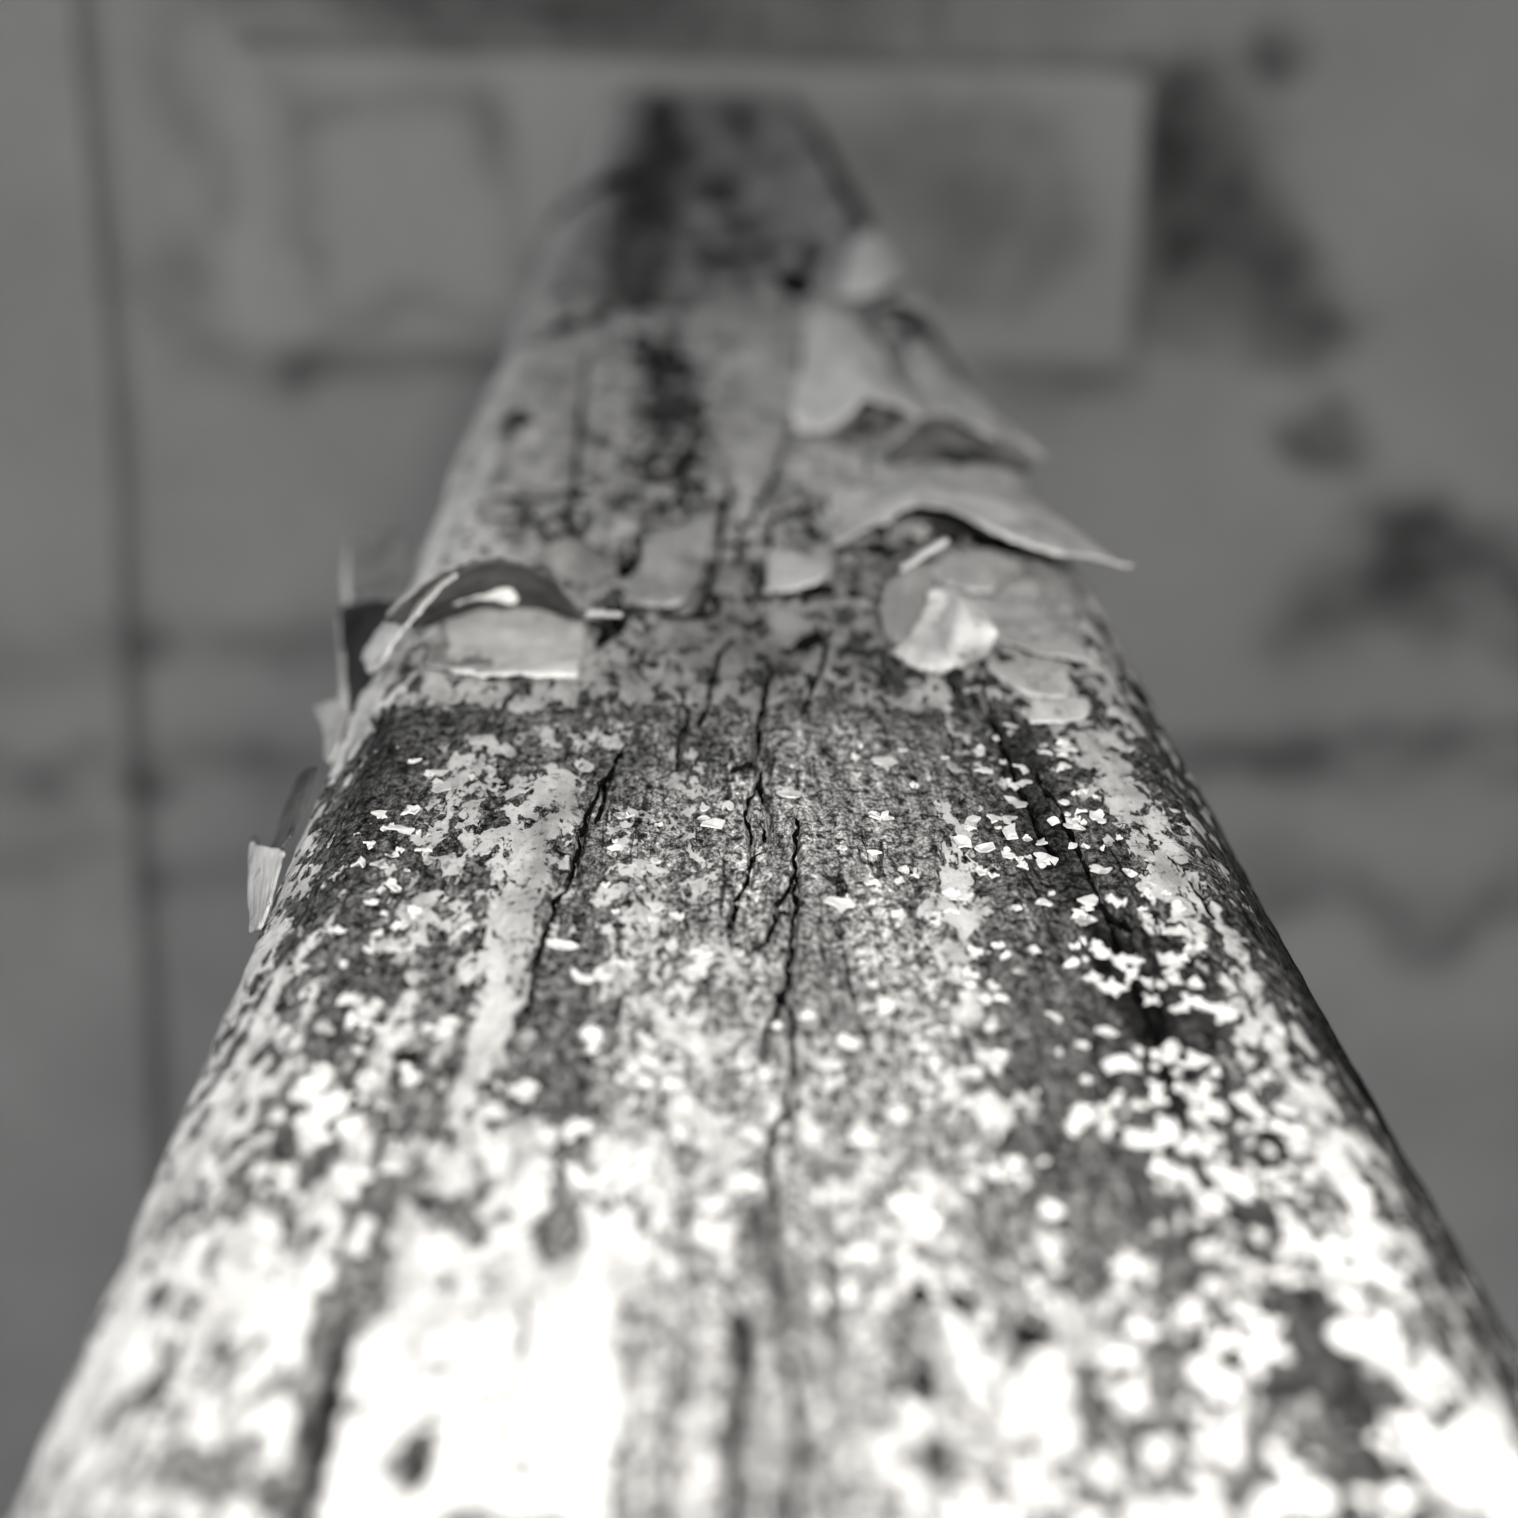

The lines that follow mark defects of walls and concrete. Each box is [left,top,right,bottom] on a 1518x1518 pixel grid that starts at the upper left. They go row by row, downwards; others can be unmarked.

damp [1144,71,1336,340]
crack [697,240,954,363]
peeling [763,230,1240,1030]
peeling [247,518,719,954]
peeling [698,800,734,829]
crack [493,290,1184,1518]
crack [1187,880,1256,1019]
peeling [336,992,460,1056]
peeling [915,1027,1010,1108]
crack [1250,1092,1284,1167]
peeling [1065,1039,1410,1518]
crack [120,1329,168,1465]